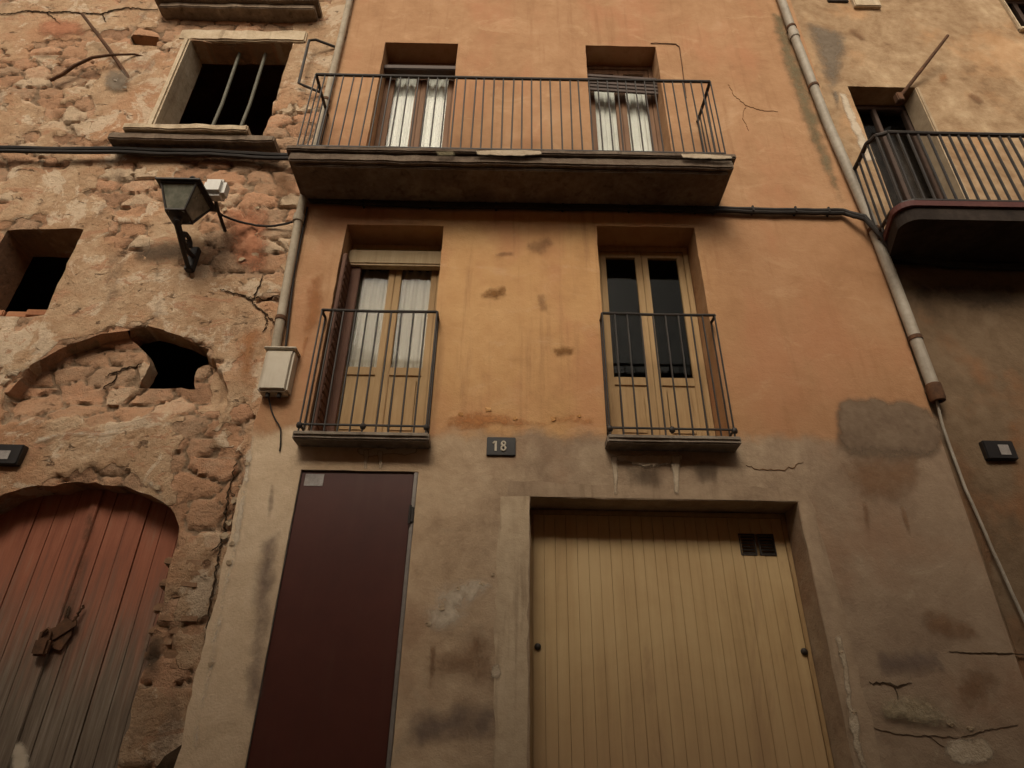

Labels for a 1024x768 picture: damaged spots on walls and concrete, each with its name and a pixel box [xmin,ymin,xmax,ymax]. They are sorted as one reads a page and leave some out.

water stain [812,26,843,100]
crack [220,275,280,333]
crack [950,649,1024,657]
crack [870,681,908,700]
crack [878,725,1014,748]